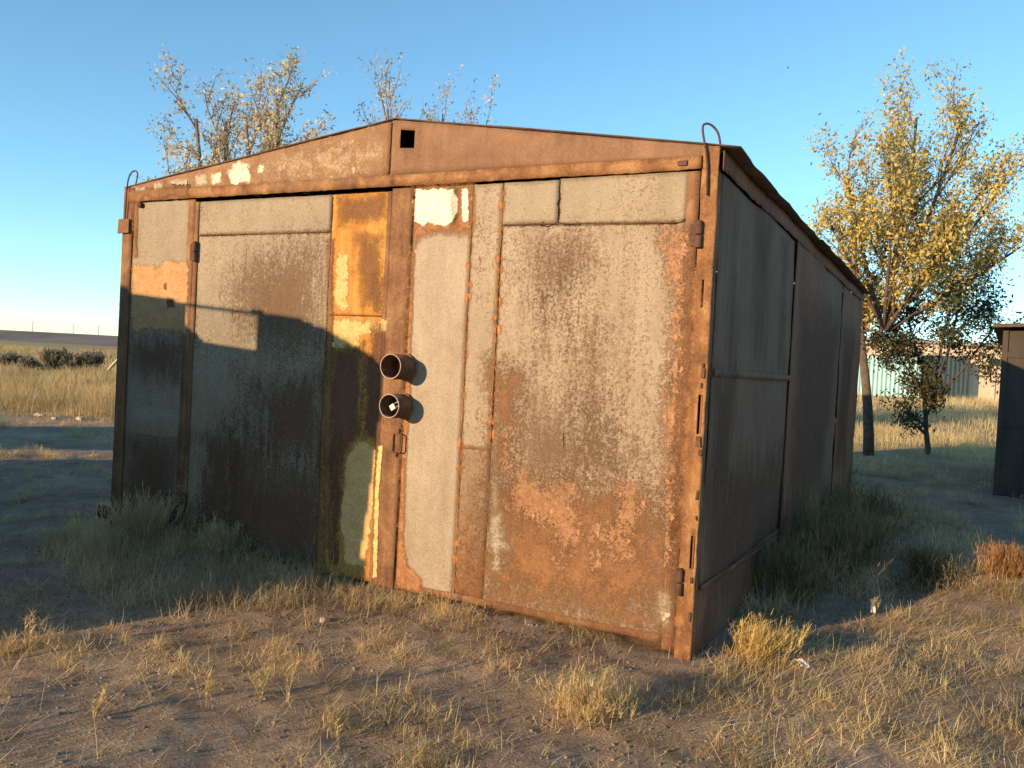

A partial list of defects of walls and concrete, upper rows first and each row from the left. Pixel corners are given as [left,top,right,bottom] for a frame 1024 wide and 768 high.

rust [338,194,387,224]
peeling [412,188,469,226]
rust [219,228,385,565]
rust [474,191,702,640]